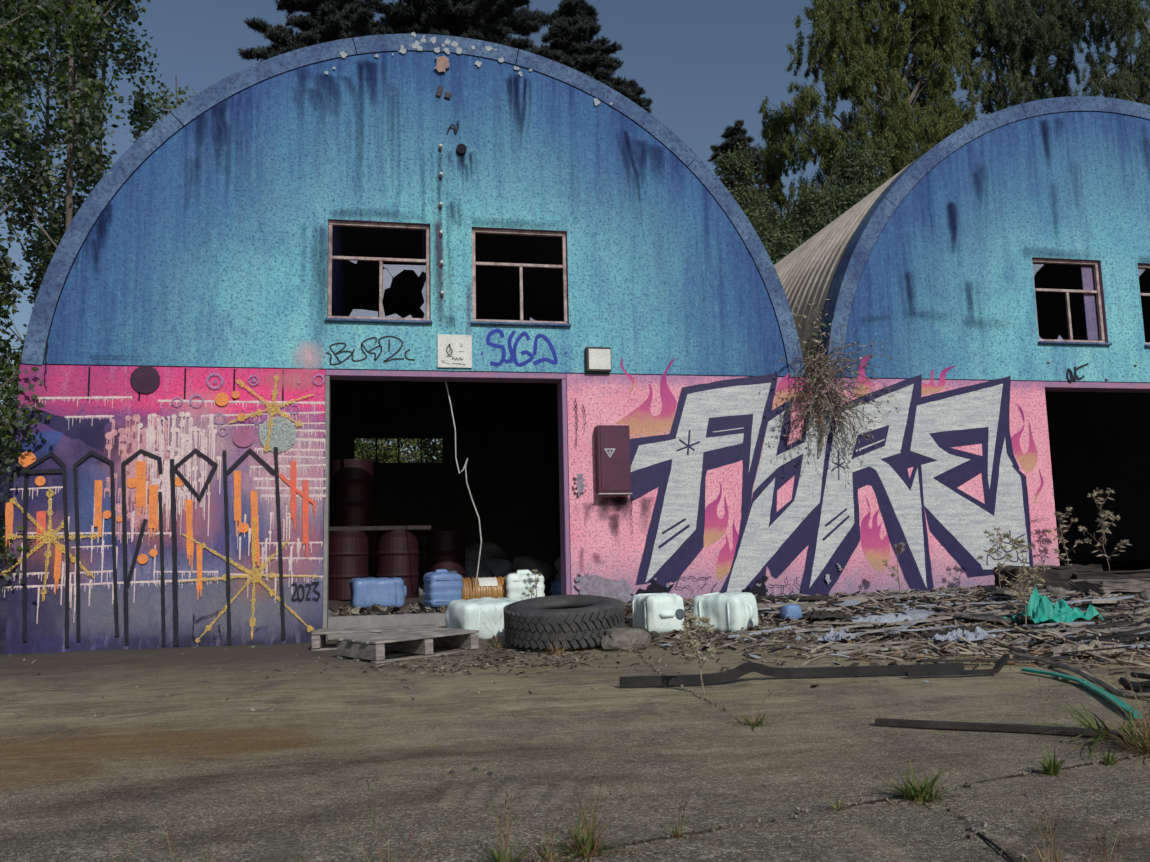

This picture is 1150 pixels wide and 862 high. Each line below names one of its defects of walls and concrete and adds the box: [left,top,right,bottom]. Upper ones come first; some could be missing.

spalling [434,56,450,73]